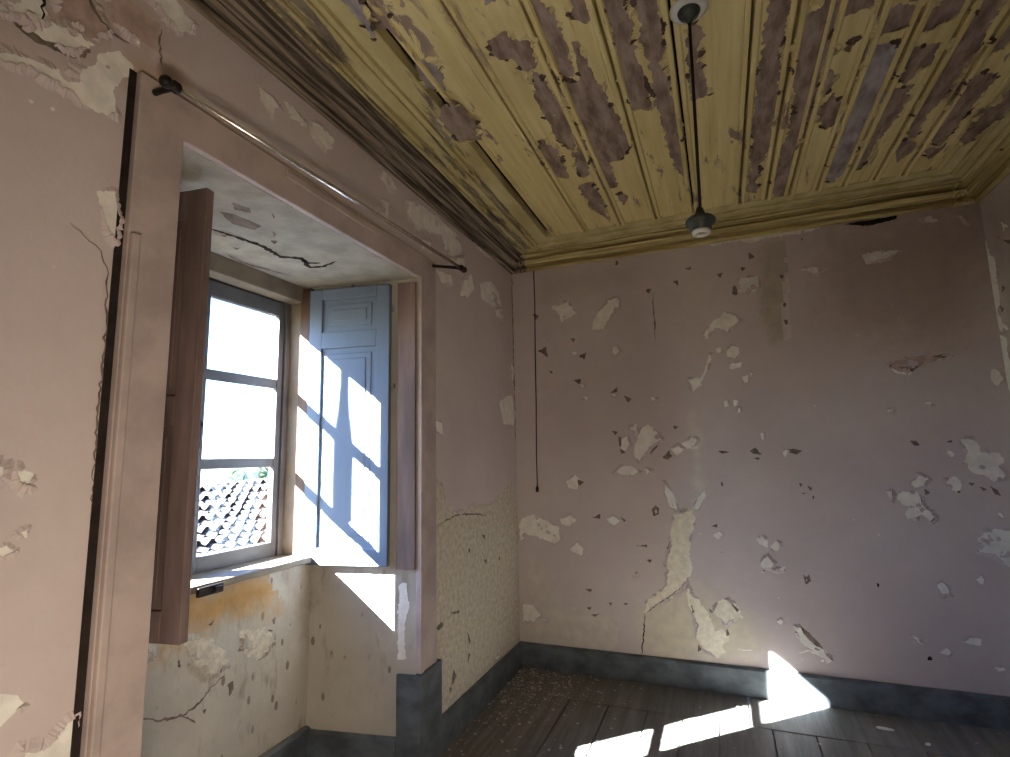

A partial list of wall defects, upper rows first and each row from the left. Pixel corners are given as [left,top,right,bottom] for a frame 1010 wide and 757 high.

crack [39,0,47,19]
crack [89,0,130,44]
crack [156,29,164,65]
peeling [683,20,714,100]
peeling [485,0,689,216]
peeling [746,0,1010,201]
crack [212,229,336,276]
crack [437,513,487,526]
peeling [612,424,743,659]
peeling [436,479,586,714]
crack [143,674,225,723]
peeling [7,710,82,757]